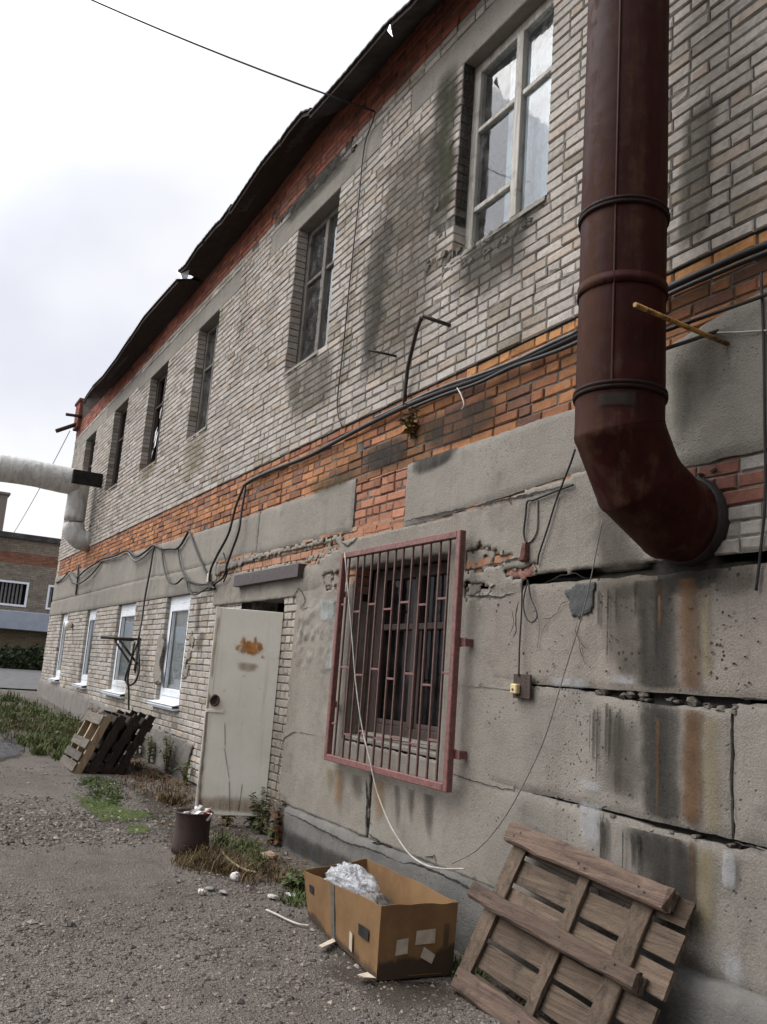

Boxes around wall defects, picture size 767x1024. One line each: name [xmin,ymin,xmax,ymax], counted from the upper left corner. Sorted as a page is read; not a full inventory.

water stain [363,63,475,360]
spalling [423,222,509,287]
spalling [463,547,538,598]
corrosion [236,638,263,666]
water stain [597,575,675,686]
water stain [589,705,628,787]
water stain [640,702,676,818]
corrosion [682,710,701,823]
crack [725,722,765,851]
water stain [599,820,608,860]
water stain [622,828,691,900]